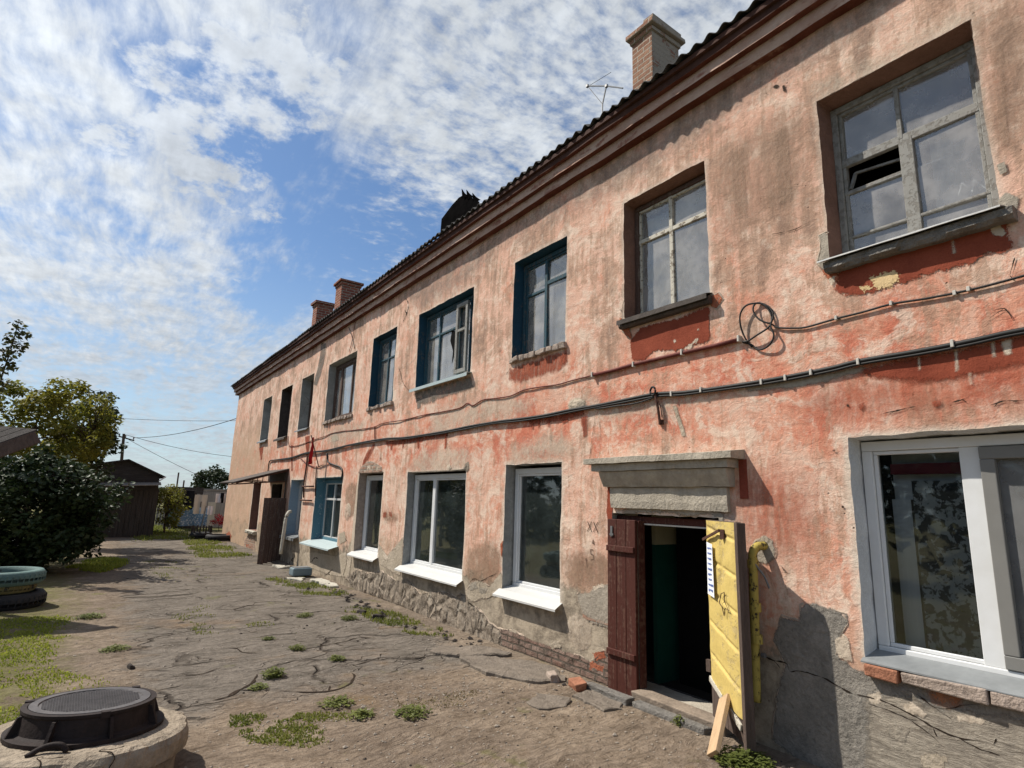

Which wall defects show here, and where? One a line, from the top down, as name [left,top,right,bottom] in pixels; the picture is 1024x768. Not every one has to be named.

peeling [816,224,1013,296]
peeling [620,292,724,361]
spalling [304,461,608,686]
crack [766,657,1023,755]
flaking render [771,602,1024,768]